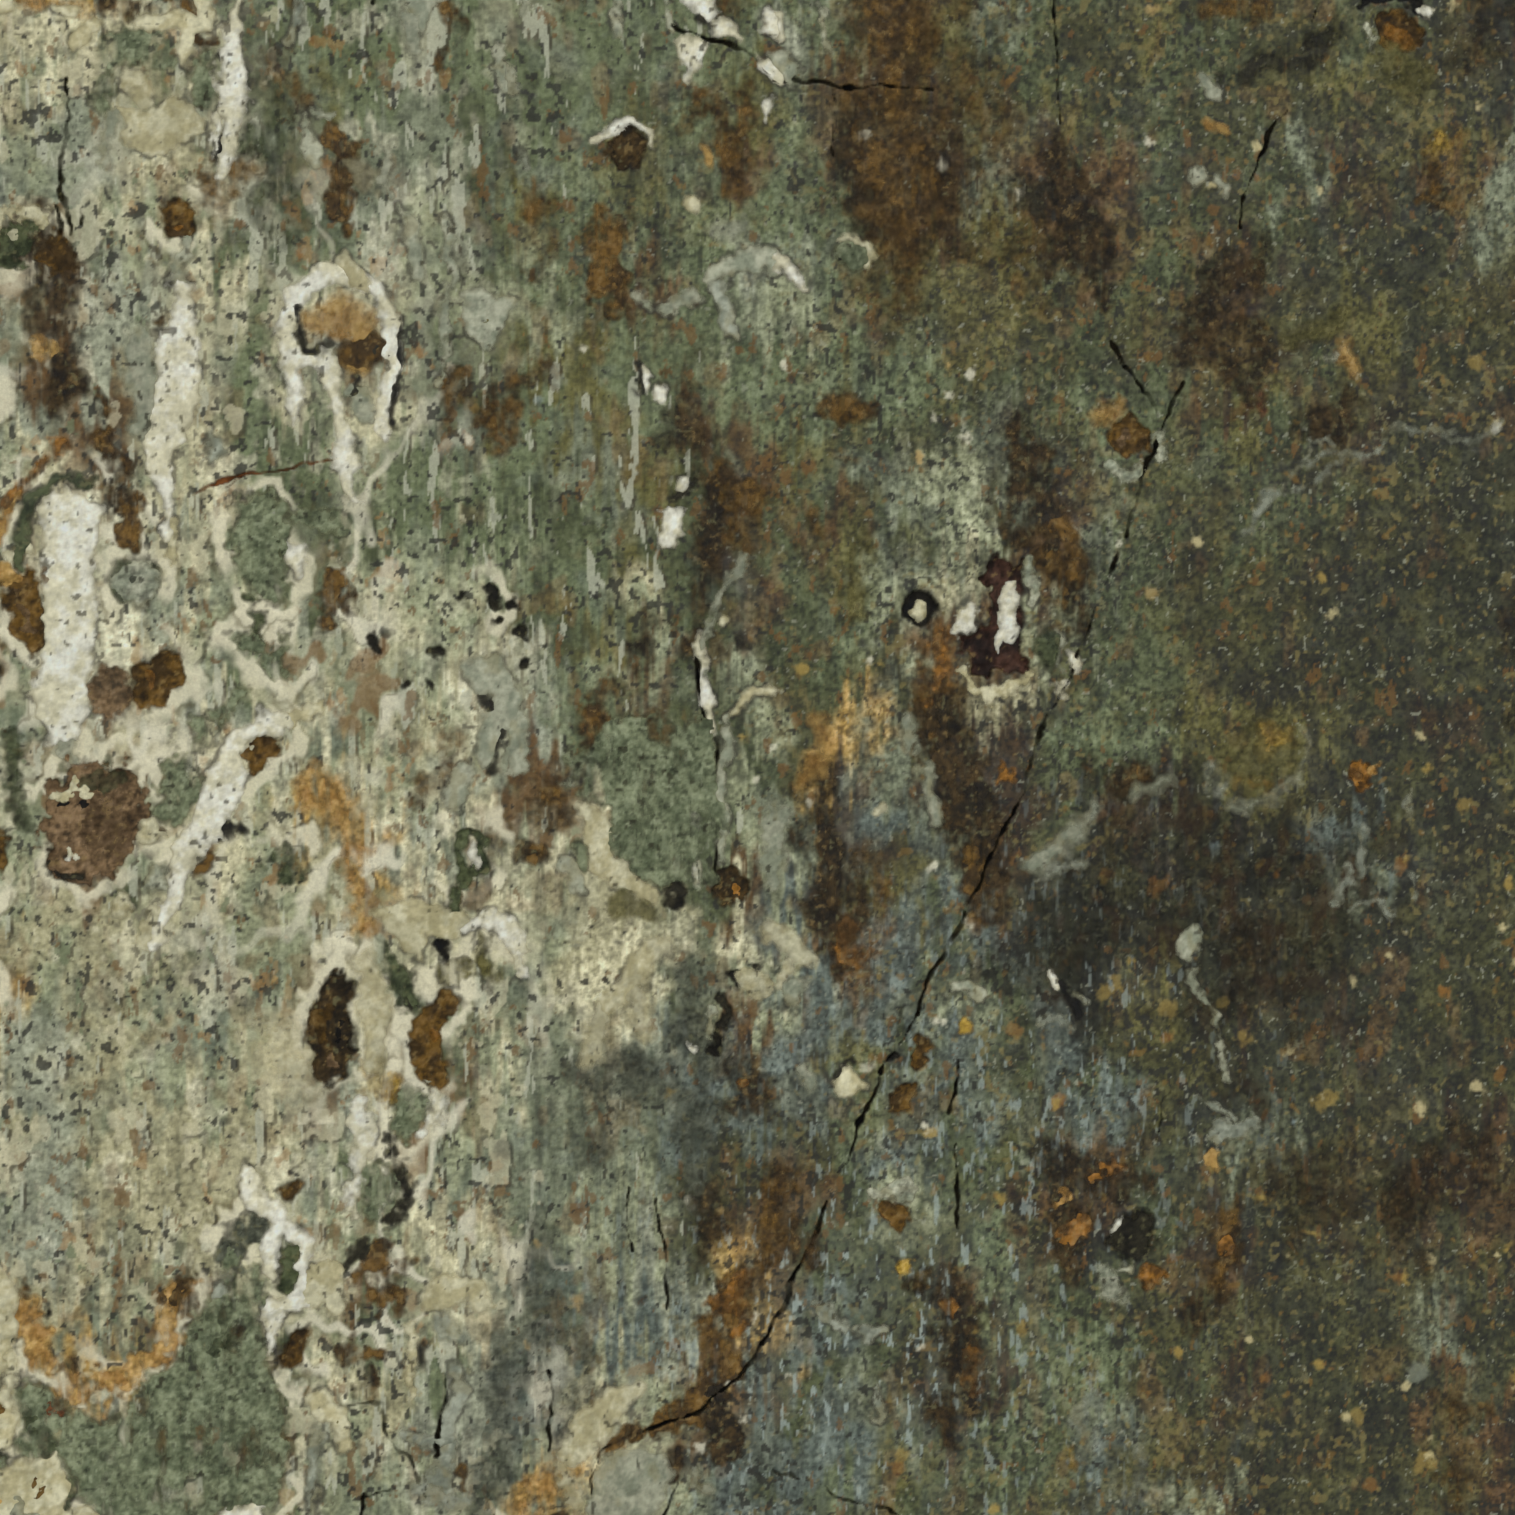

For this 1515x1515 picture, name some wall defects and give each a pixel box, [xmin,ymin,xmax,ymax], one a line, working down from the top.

crack [671,24,933,91]
crack [1109,340,1185,481]
spalling [902,590,939,627]
spalling [951,554,1041,708]
peeling [187,688,249,743]
crack [694,657,719,764]
spalling [0,727,203,887]
crack [848,610,1094,1161]
spalling [305,968,358,1089]
rust [597,1166,820,1483]
crack [590,1187,828,1494]
rust [515,1464,582,1515]